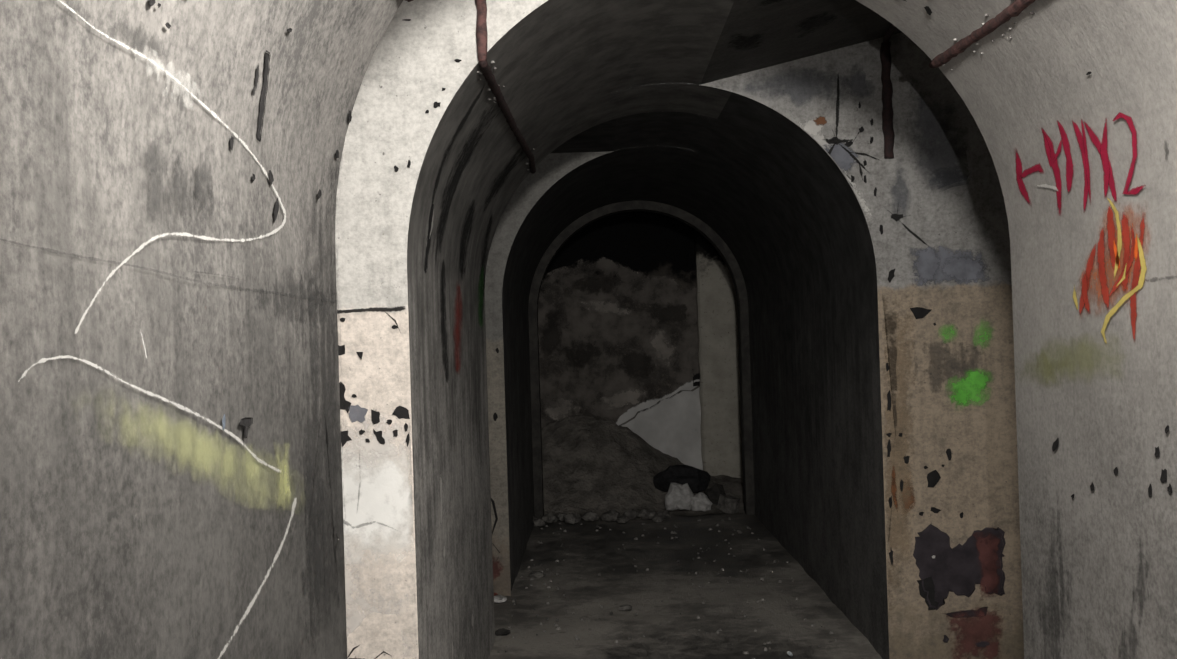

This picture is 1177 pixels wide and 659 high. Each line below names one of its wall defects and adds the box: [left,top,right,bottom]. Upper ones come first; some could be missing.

peeling [339,382,413,562]
peeling [924,449,952,488]
crack [347,645,391,659]
peeling [913,507,1006,659]